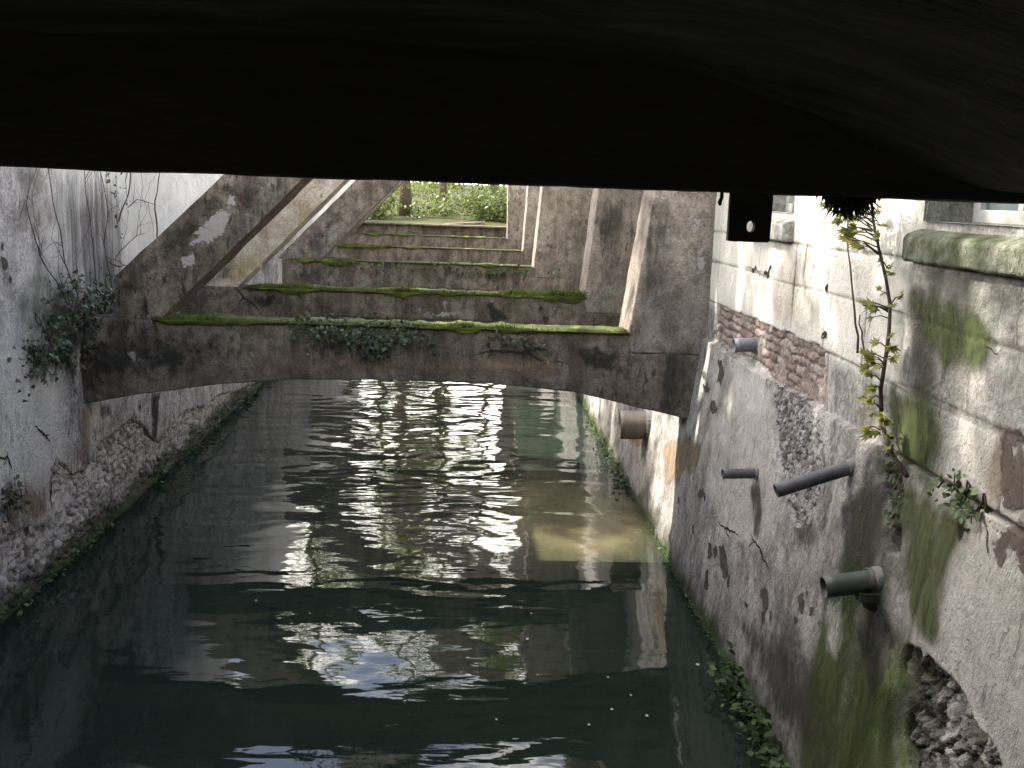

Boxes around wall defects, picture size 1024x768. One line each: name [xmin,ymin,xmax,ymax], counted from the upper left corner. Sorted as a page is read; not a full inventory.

flaking render [701,305,827,480]
flaking render [0,382,259,620]
crack [717,521,769,568]
flaking render [786,484,822,525]
water stain [857,609,892,717]
flaking render [907,647,1002,768]